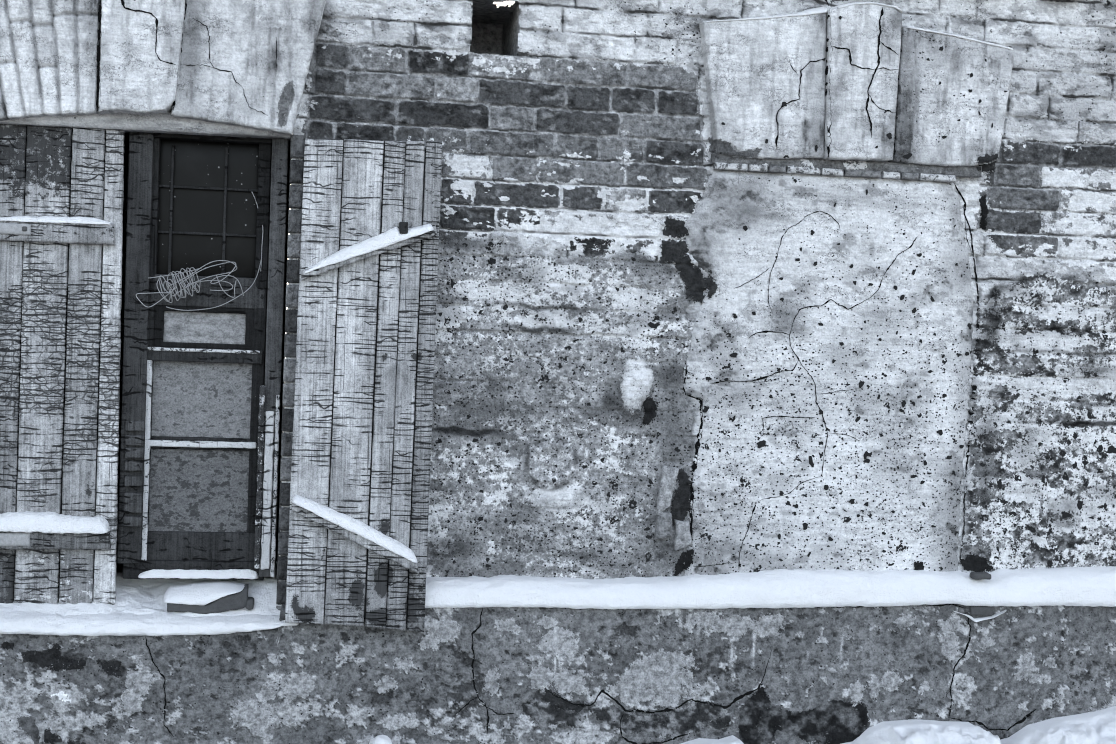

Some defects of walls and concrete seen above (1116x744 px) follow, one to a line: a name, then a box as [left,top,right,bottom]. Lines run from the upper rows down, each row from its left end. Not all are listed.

crack [96,0,268,116]
crack [775,0,902,157]
peeling [277,38,768,303]
peeling [974,137,1116,281]
crack [662,211,917,567]
crack [456,608,514,733]
crack [548,650,772,744]
crack [922,604,1036,731]